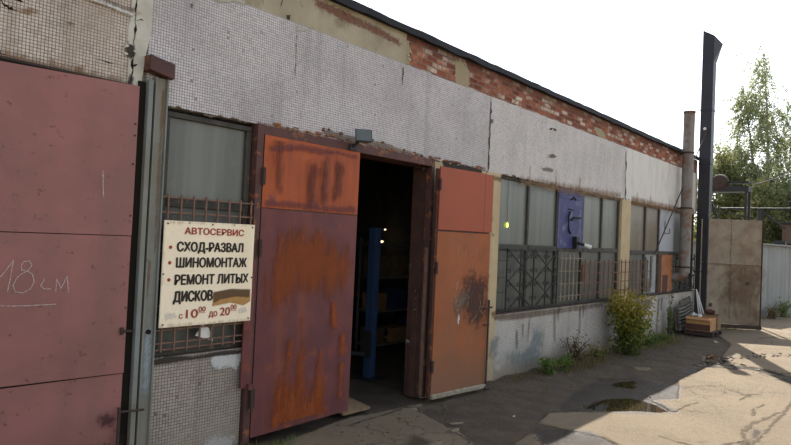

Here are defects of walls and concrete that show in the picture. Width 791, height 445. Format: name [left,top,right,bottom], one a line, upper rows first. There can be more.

crack [100,0,144,76]
peeling [315,0,412,60]
crack [486,98,494,170]
rust [272,340,325,428]
crack [739,394,791,445]